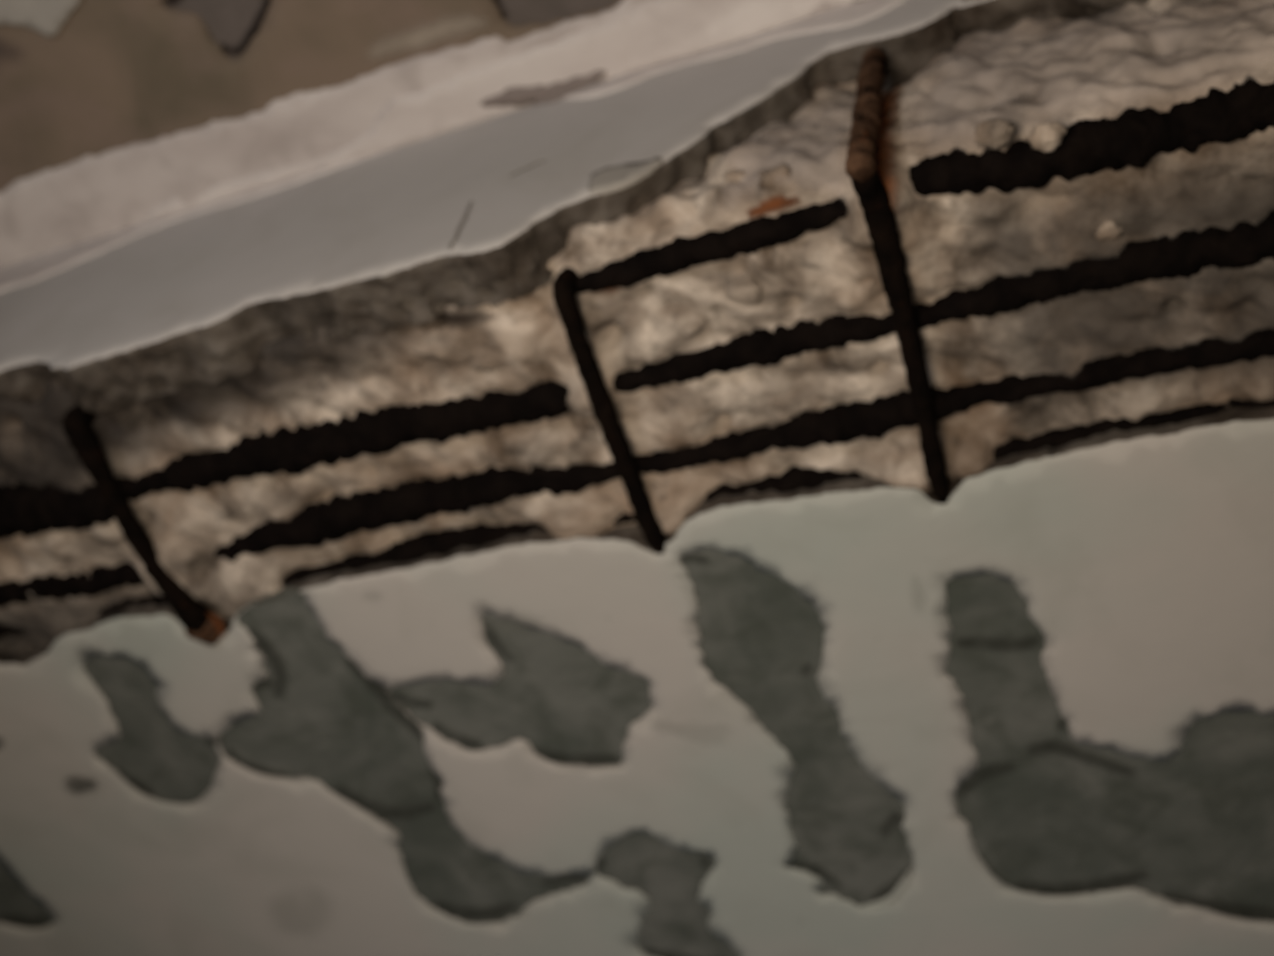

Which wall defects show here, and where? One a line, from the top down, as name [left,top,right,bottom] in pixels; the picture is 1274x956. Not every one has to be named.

flaking render [0,0,905,293]
corrosion [875,93,895,203]
spalling [882,0,1274,305]
spalling [919,311,1090,390]
spalling [1109,264,1264,356]
spalling [937,359,1274,484]
spalling [0,519,162,629]
spalling [84,82,932,956]
peeling [945,574,1274,923]
peeling [0,861,53,928]